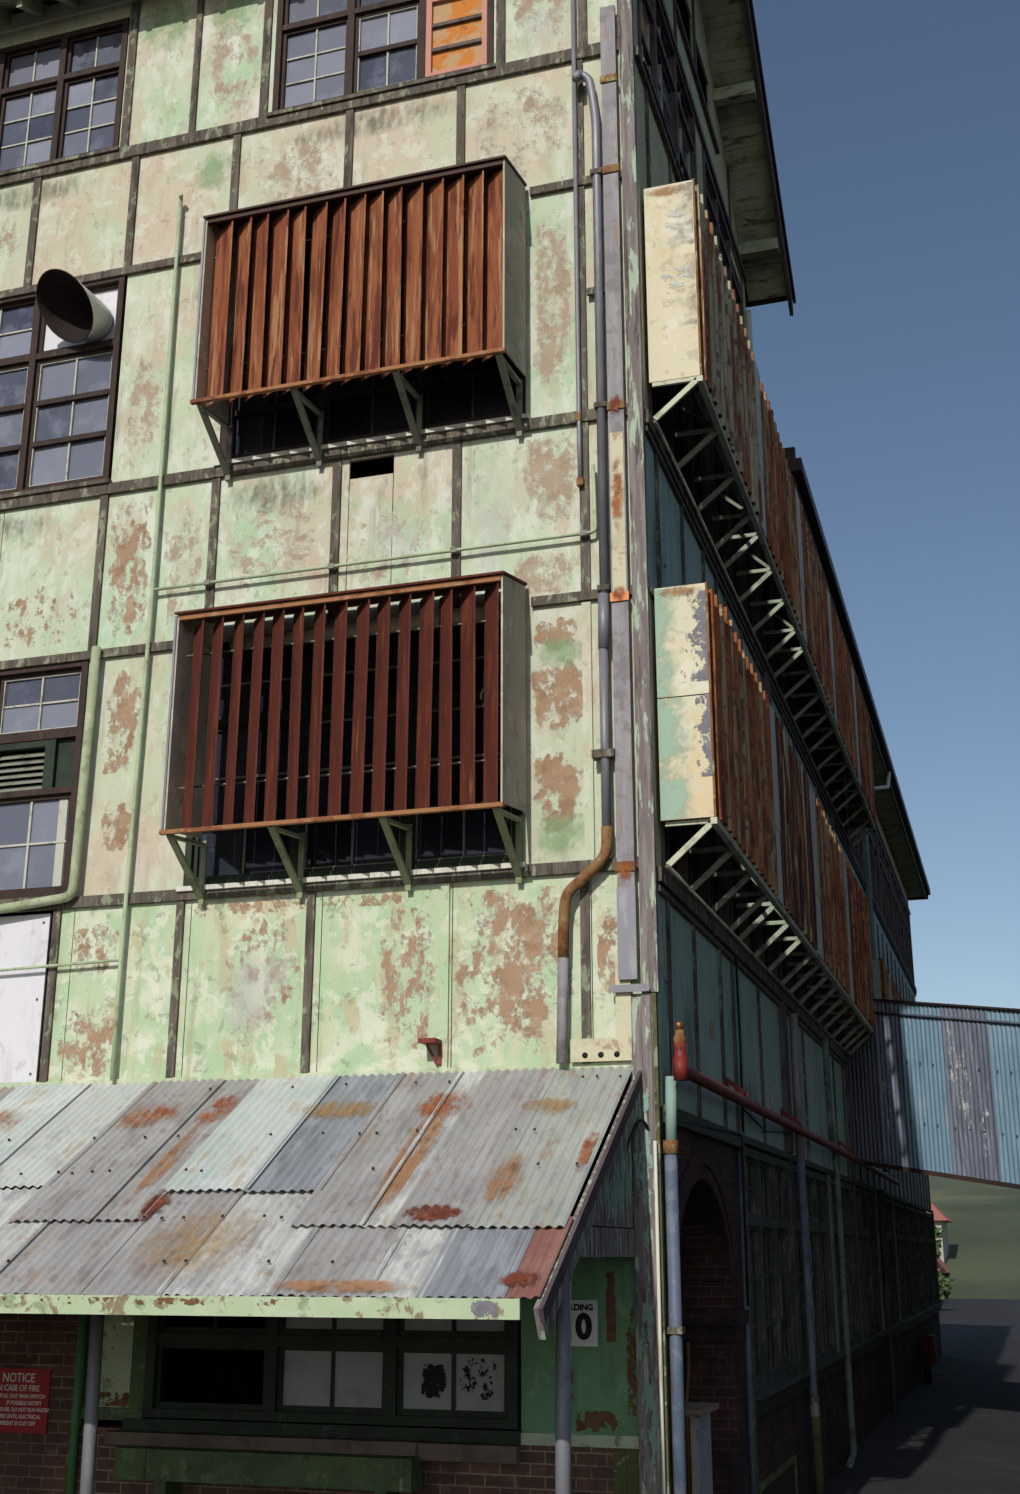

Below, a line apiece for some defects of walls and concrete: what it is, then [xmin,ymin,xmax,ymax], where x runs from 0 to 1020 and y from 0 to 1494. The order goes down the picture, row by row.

peeling [107,500,202,636]
peeling [102,670,141,774]
peeling [531,616,583,730]
peeling [533,752,584,834]
peeling [322,885,574,1057]
peeling [57,1010,114,1077]
rust [138,1095,235,1220]
rust [375,1093,460,1207]
rust [579,1134,597,1164]
rust [402,1204,461,1221]
rust [287,1280,393,1291]
rust [500,1271,540,1287]